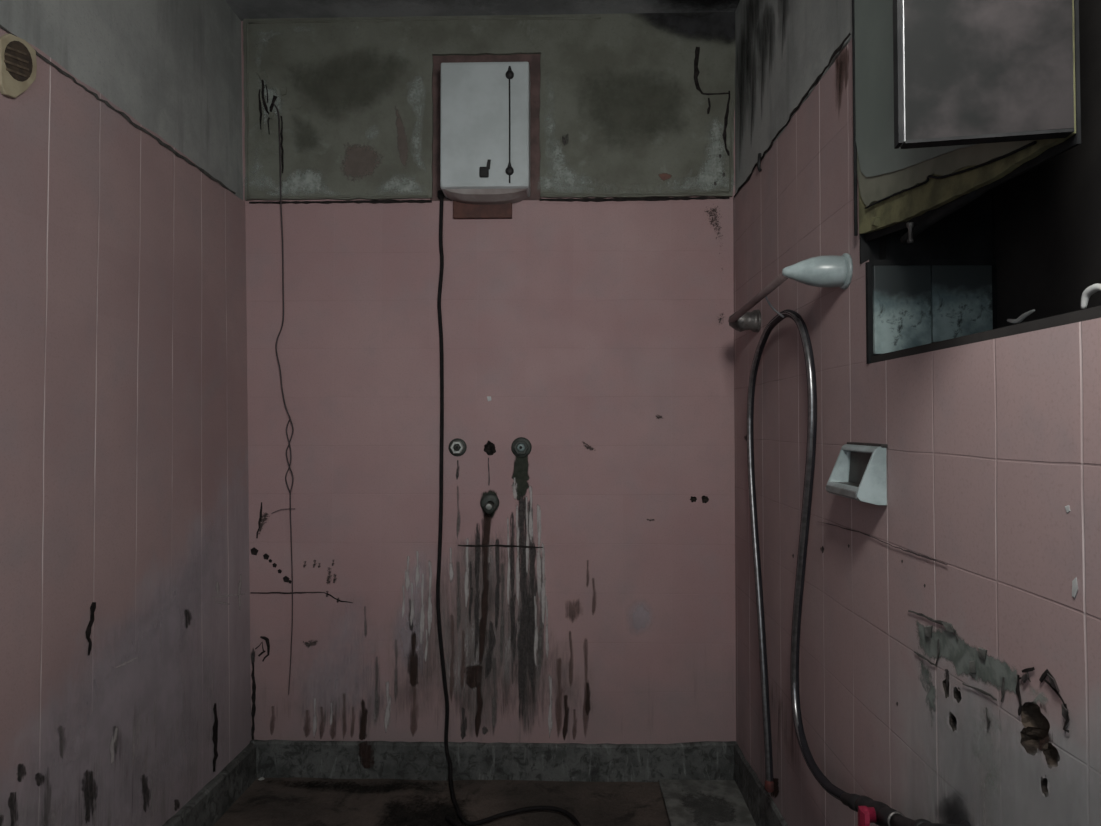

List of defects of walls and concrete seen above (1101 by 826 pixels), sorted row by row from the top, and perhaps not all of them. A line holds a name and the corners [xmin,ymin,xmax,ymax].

damp [249,165,324,195]
crack [540,32,851,202]
damp [674,120,734,191]
damp [402,551,432,667]
damp [449,456,590,740]
spalling [908,610,1069,733]